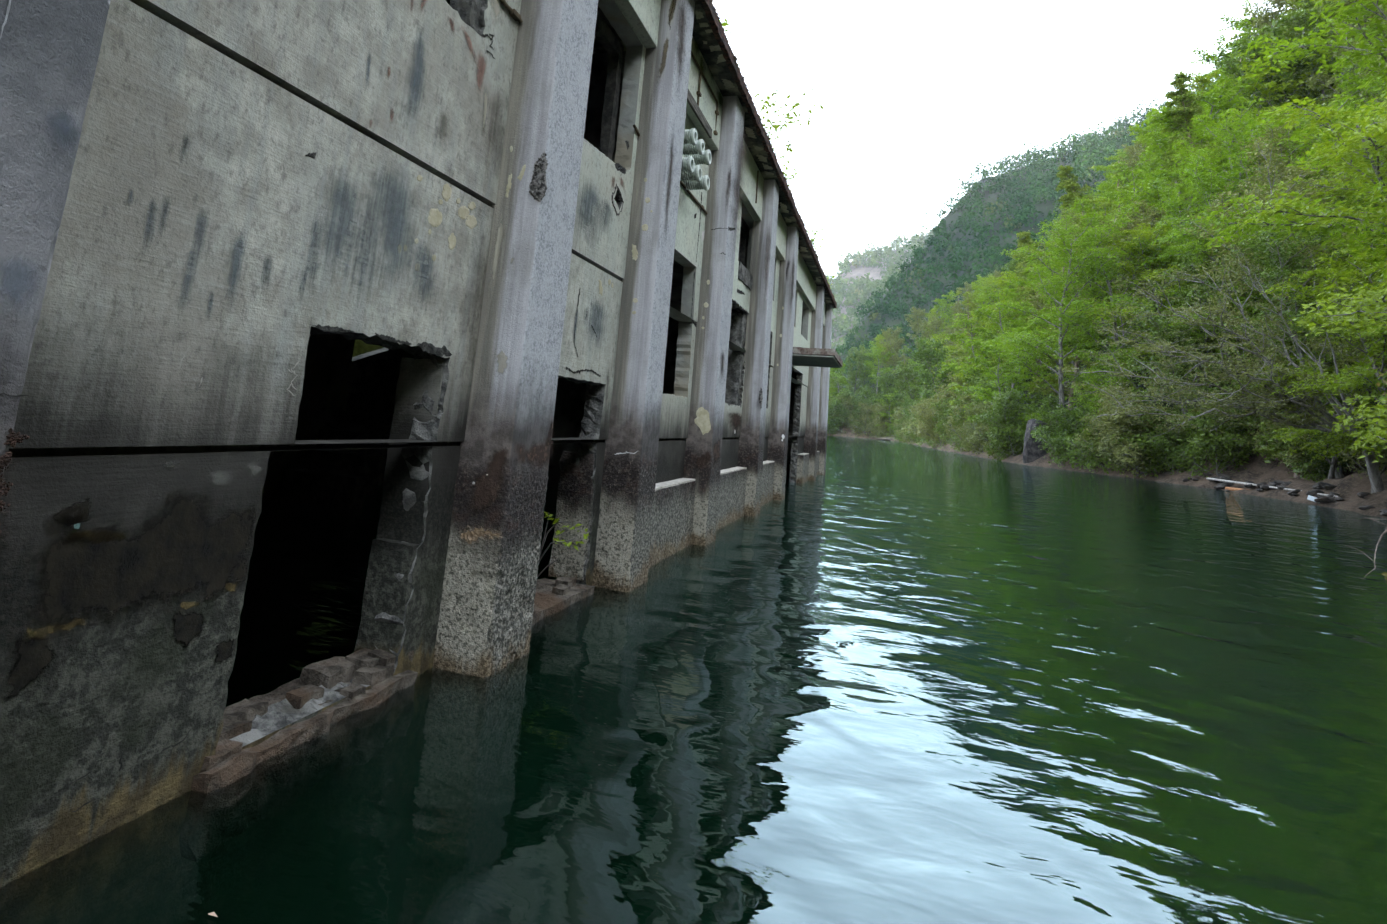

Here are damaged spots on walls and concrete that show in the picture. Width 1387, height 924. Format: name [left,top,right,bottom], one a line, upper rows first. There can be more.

damp [410,37,423,108]
spalling [505,152,548,202]
damp [231,240,242,287]
damp [301,178,432,297]